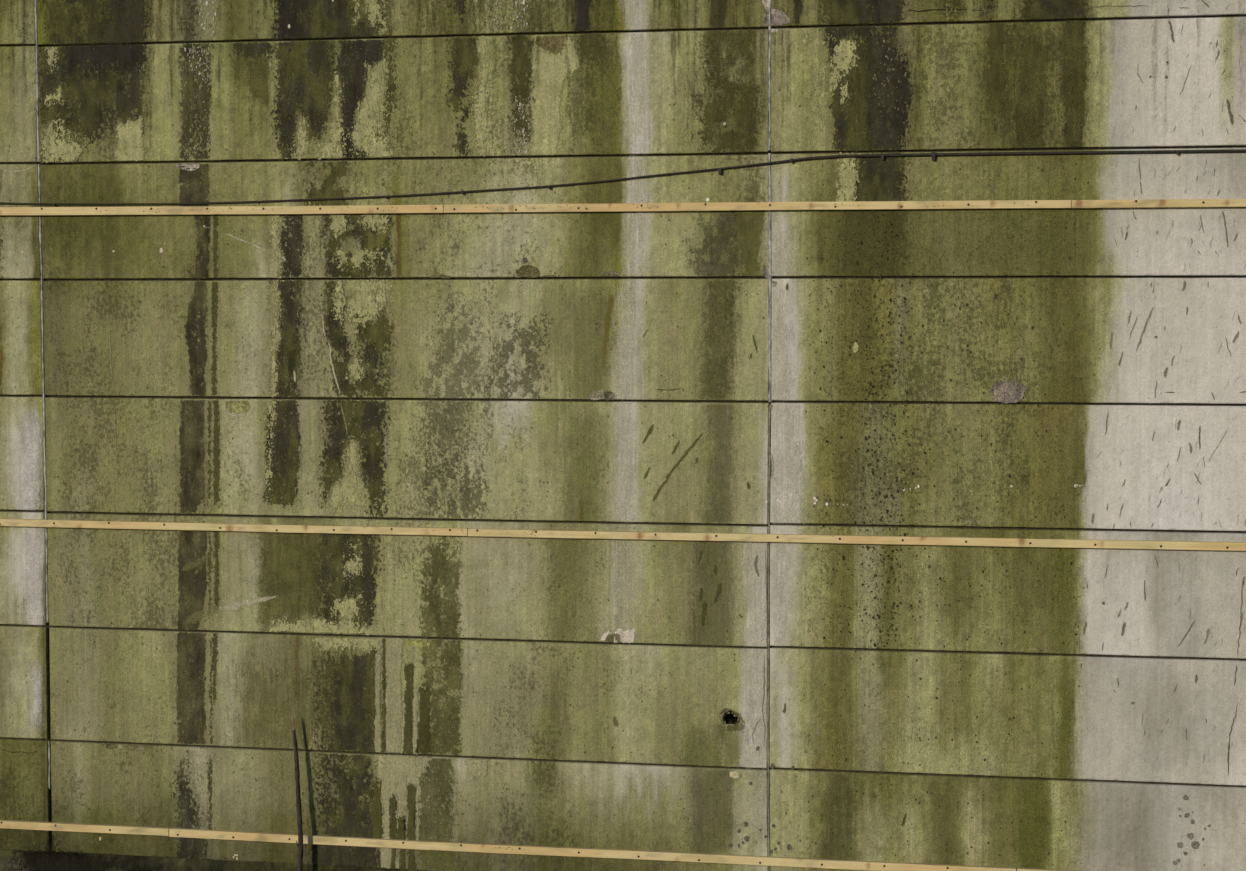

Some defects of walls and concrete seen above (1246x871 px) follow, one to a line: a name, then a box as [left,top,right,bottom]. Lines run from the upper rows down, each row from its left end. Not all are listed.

water stain [980,0,1089,148]
water stain [149,0,221,513]
water stain [172,530,220,859]
water stain [370,536,488,871]
spalling [719,708,745,731]